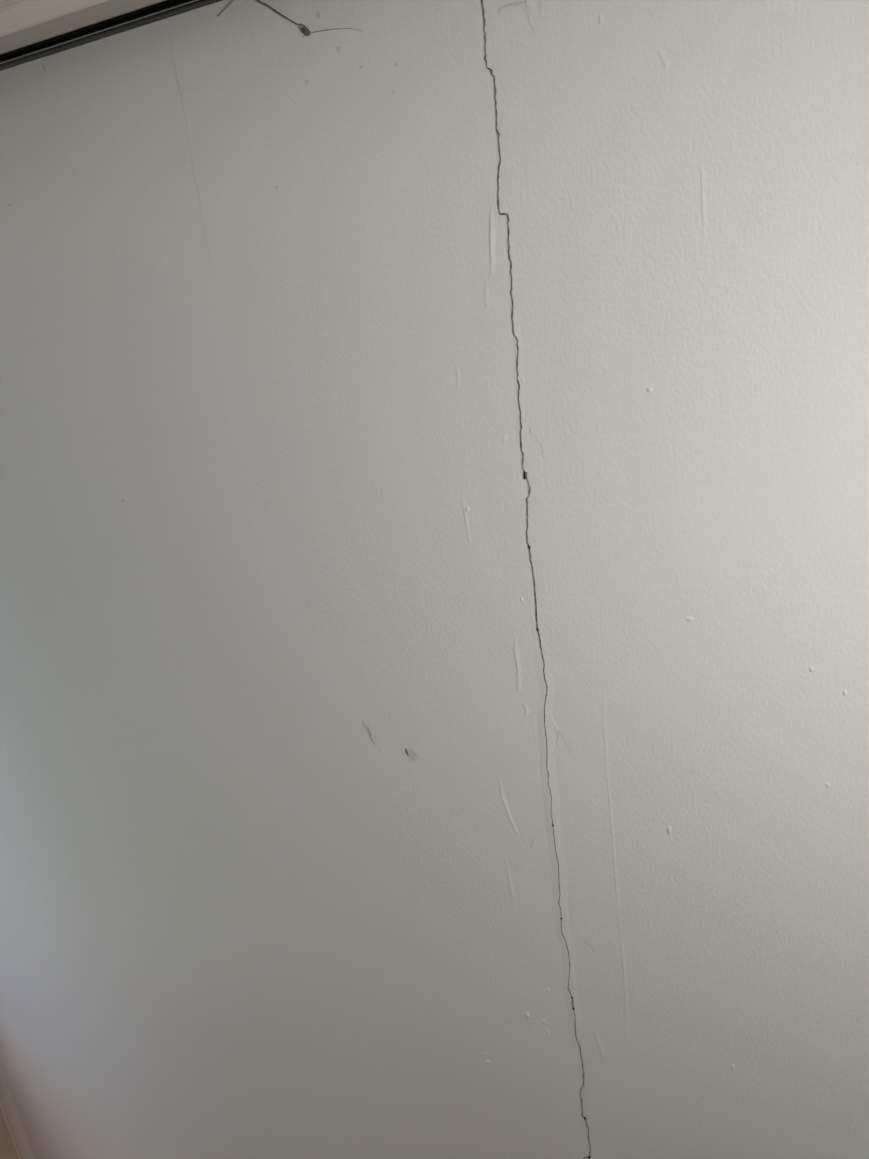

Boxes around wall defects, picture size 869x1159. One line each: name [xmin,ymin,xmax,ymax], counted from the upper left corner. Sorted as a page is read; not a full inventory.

crack [481,0,590,1159]